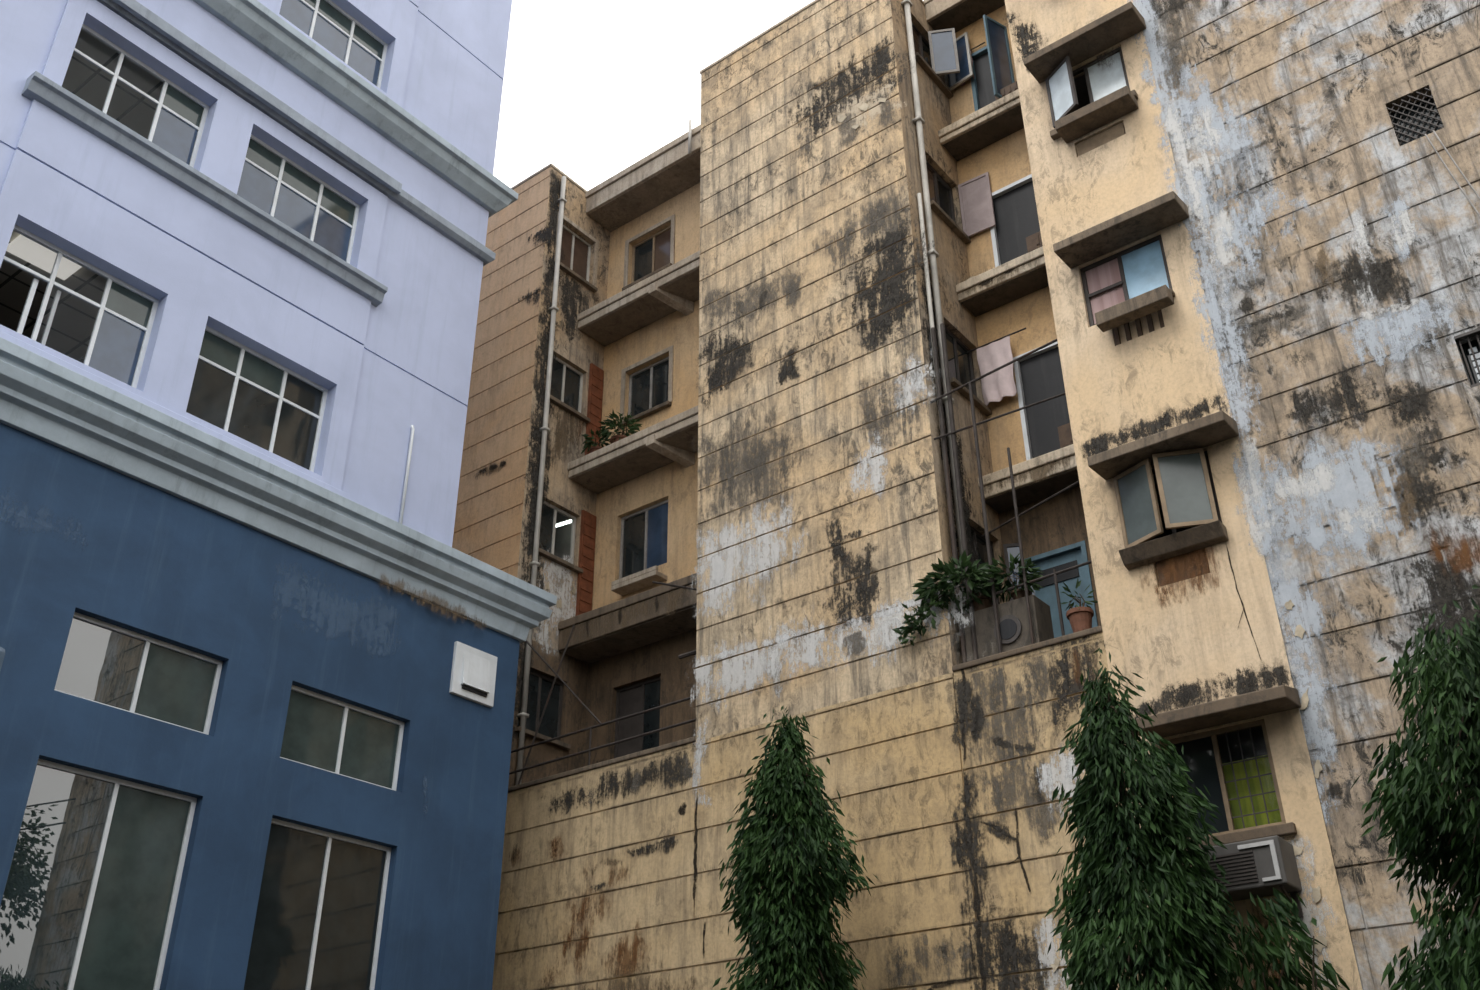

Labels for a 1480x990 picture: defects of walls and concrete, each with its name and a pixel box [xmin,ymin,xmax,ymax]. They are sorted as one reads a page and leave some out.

damp [788,36,912,158]
damp [697,290,767,411]
damp [786,282,798,311]
damp [837,202,980,576]
damp [1082,0,1470,584]
damp [541,438,971,814]
damp [972,629,1105,817]
damp [1129,666,1295,719]